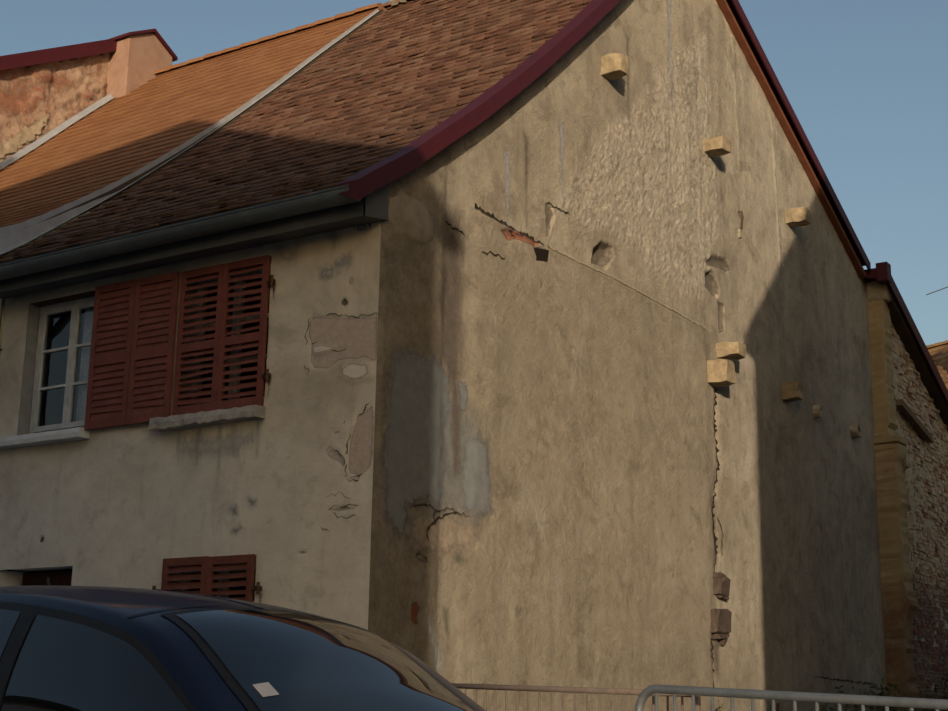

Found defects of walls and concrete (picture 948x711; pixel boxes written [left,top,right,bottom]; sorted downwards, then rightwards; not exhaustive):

crack [475,203,544,259]
flaking render [591,243,613,268]
flaking render [327,399,373,482]
crack [712,388,723,572]